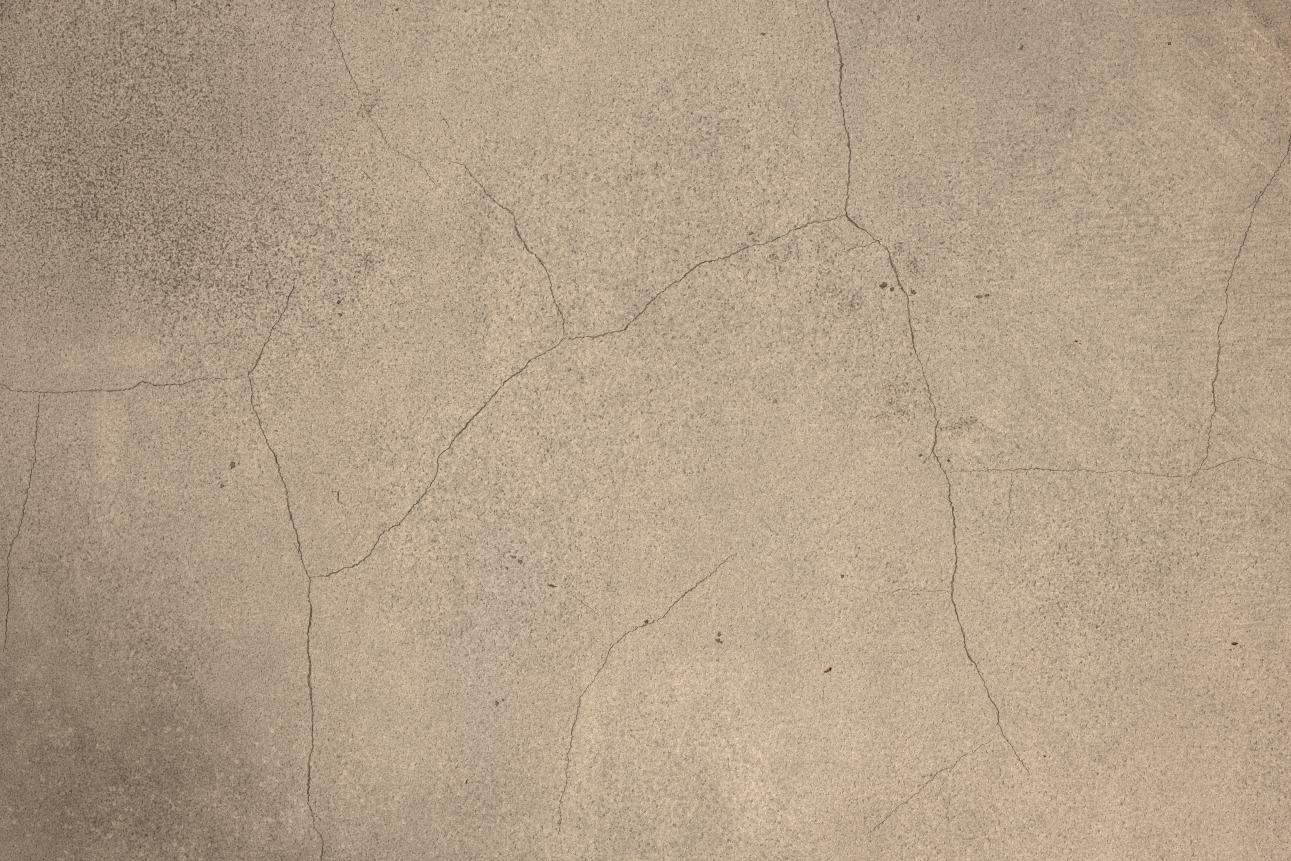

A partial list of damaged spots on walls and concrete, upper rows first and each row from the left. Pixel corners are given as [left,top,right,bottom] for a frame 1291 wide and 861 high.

crack [2,376,238,651]
crack [248,0,1112,861]
crack [1125,457,1291,477]
crack [1207,135,1291,450]